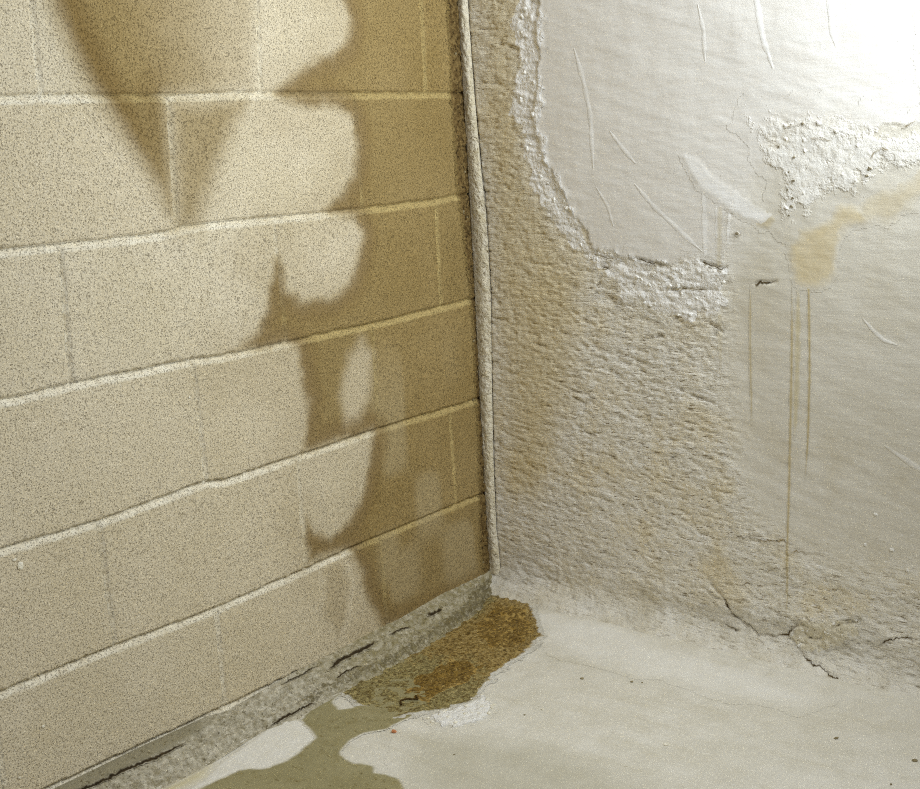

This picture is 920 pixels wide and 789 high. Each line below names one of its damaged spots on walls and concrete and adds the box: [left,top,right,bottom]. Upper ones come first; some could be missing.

peeling [508,0,736,332]
spalling [727,89,920,244]
water stain [28,0,492,789]
crack [77,738,192,789]
crack [267,701,316,728]
crack [713,533,860,681]
spalling [787,615,863,657]
crack [878,636,914,647]